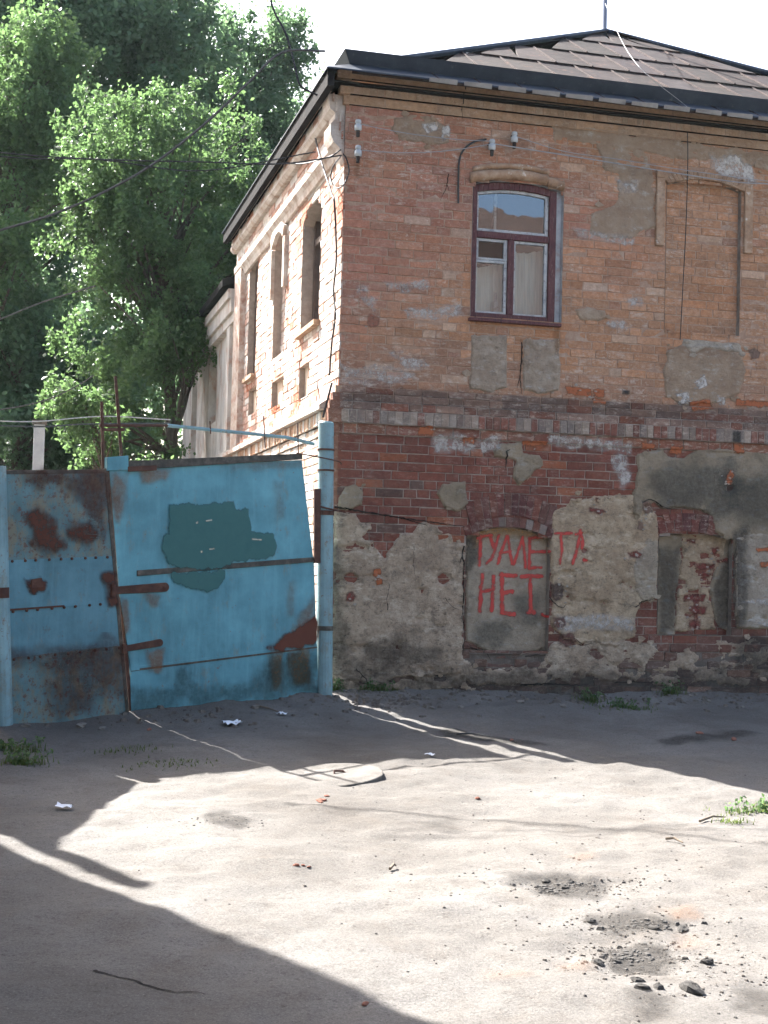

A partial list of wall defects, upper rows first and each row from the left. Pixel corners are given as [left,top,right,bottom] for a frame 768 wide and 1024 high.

crack [516,342,524,394]
rust [26,469,111,553]
rust [26,580,47,595]
peeling [333,437,768,691]
rust [267,612,319,688]